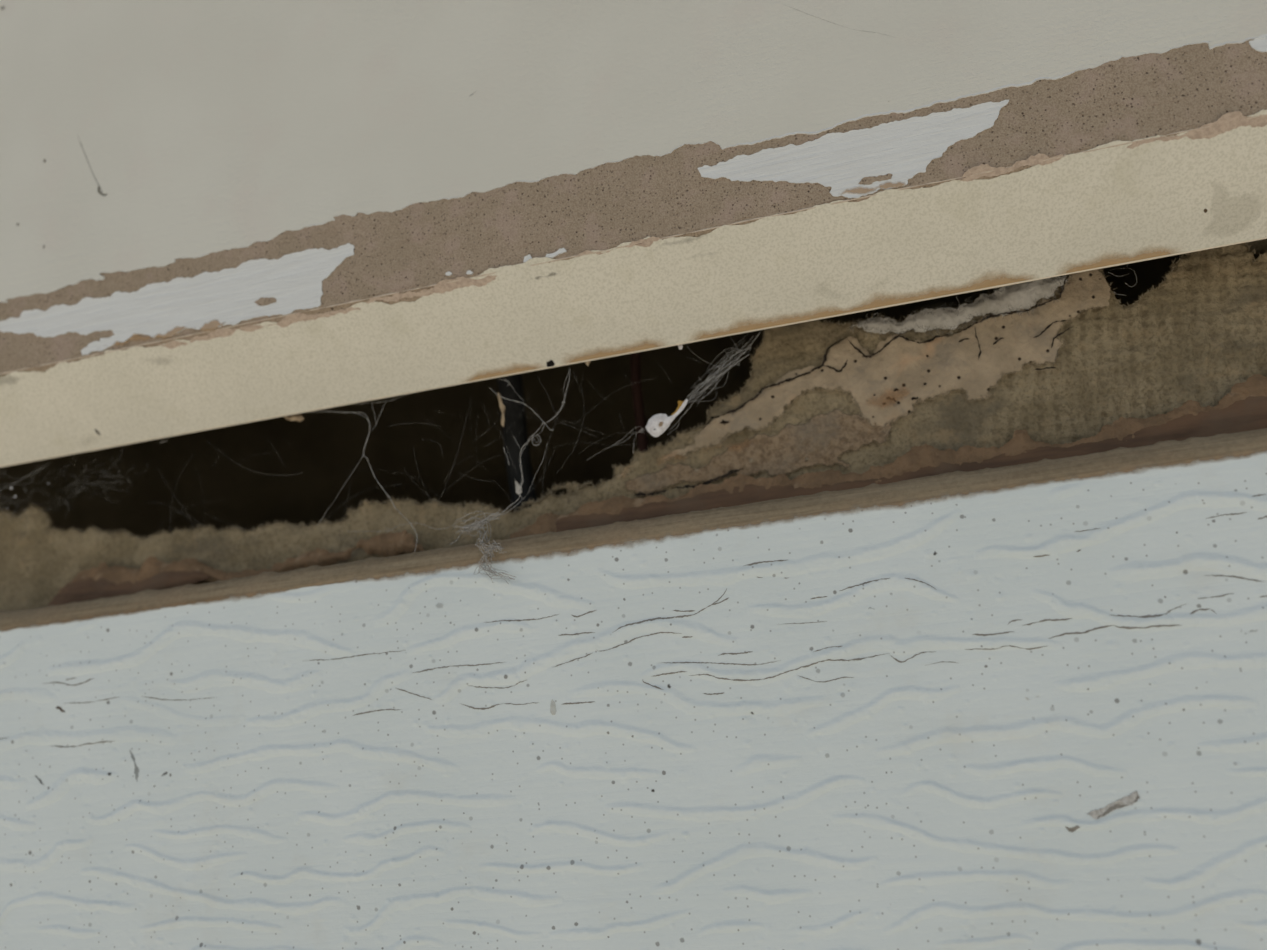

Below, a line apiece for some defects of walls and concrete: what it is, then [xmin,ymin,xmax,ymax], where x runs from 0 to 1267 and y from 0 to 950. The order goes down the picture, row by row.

peeling [0,34,1267,376]
spalling [0,378,513,538]
peeling [0,428,1267,631]
spalling [521,330,764,500]